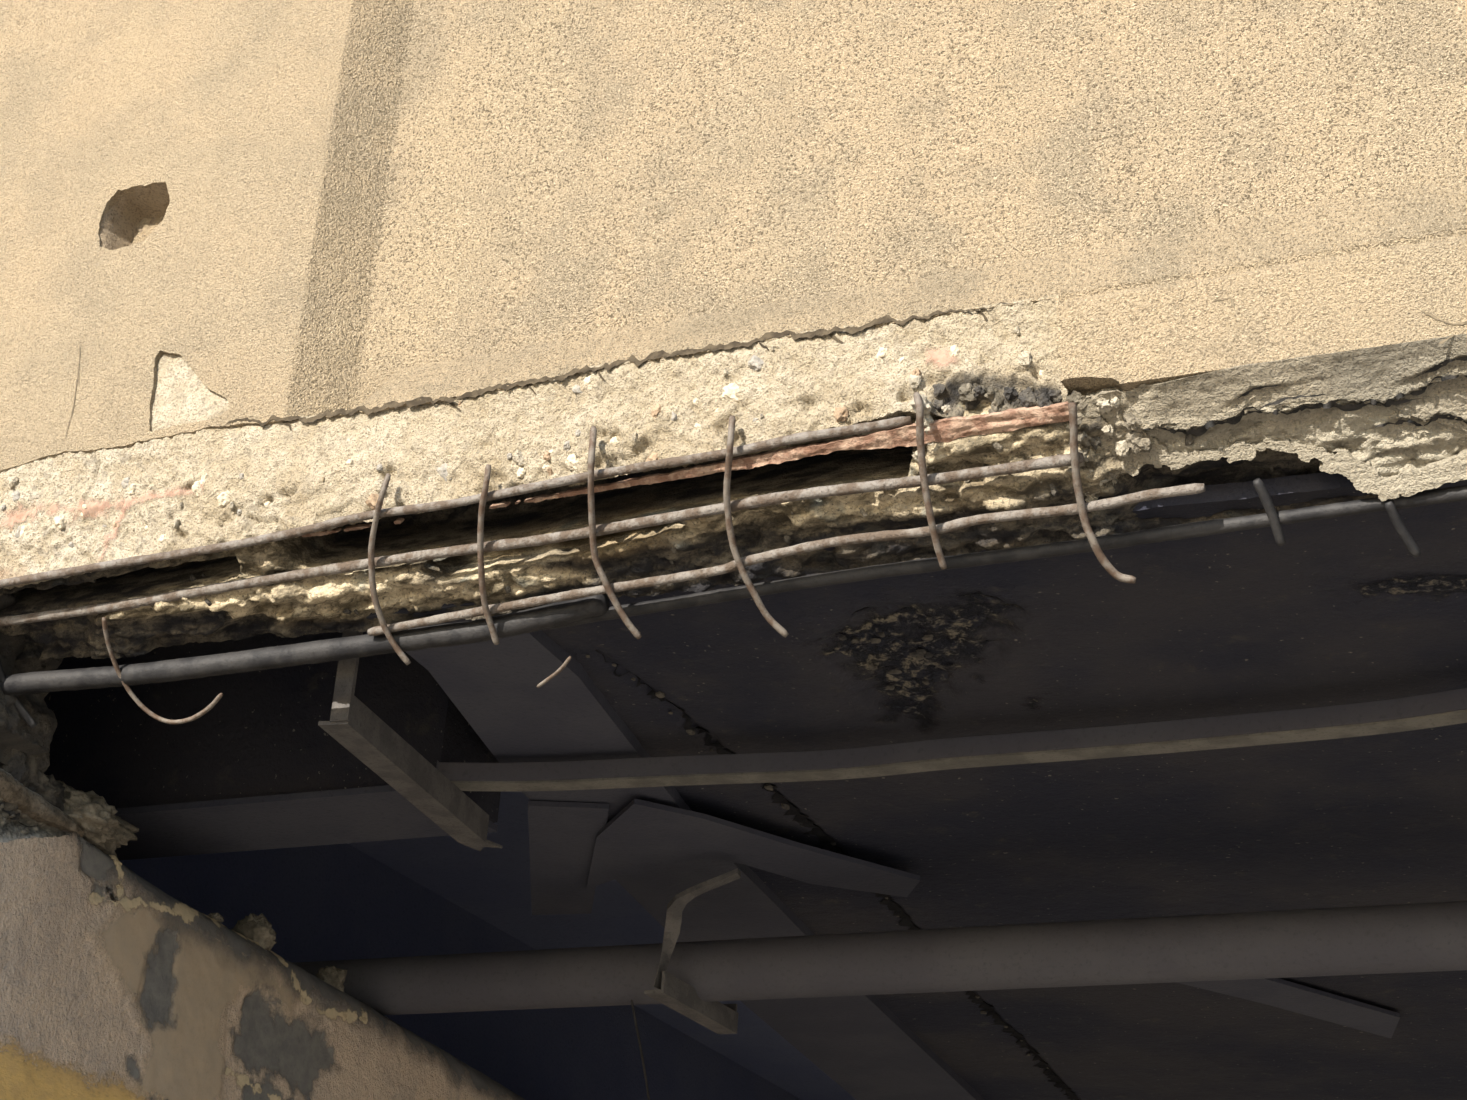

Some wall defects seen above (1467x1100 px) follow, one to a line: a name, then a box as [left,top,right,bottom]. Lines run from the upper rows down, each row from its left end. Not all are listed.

crack [1144,310,1467,436]
corrosion [302,524,372,537]
spalling [0,294,1467,662]
corrosion [489,401,1069,509]
spalling [821,592,1024,731]
spalling [0,798,72,843]
peeling [88,855,368,1024]
peeling [225,1067,281,1100]